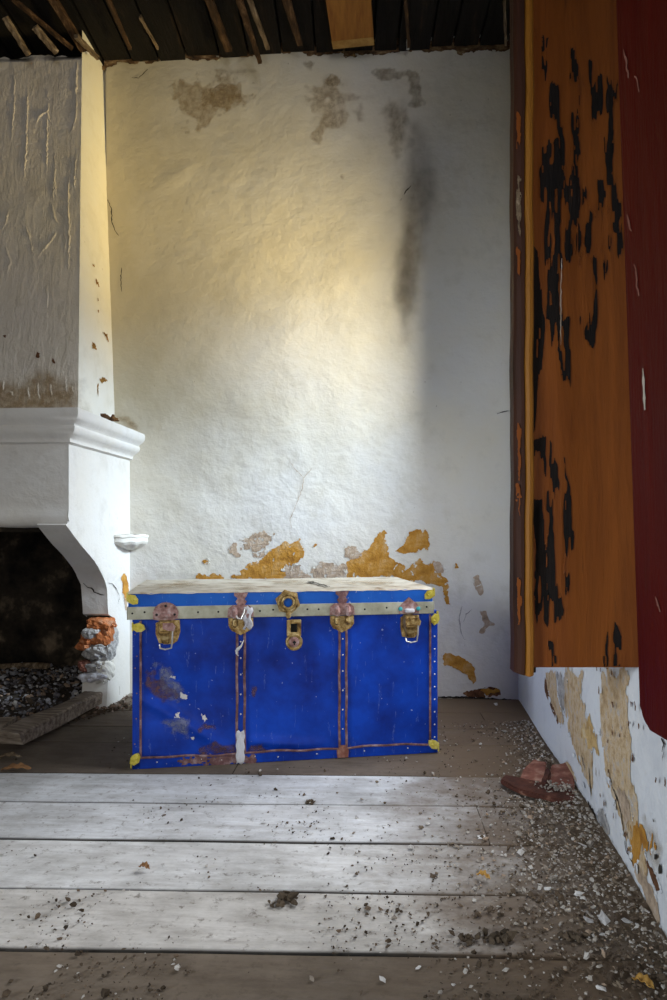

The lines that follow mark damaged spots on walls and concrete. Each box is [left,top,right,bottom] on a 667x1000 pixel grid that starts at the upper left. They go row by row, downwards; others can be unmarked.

water stain [0,377,72,408]
peeling [192,528,459,607]
peeling [441,652,503,706]
peeling [500,622,662,928]